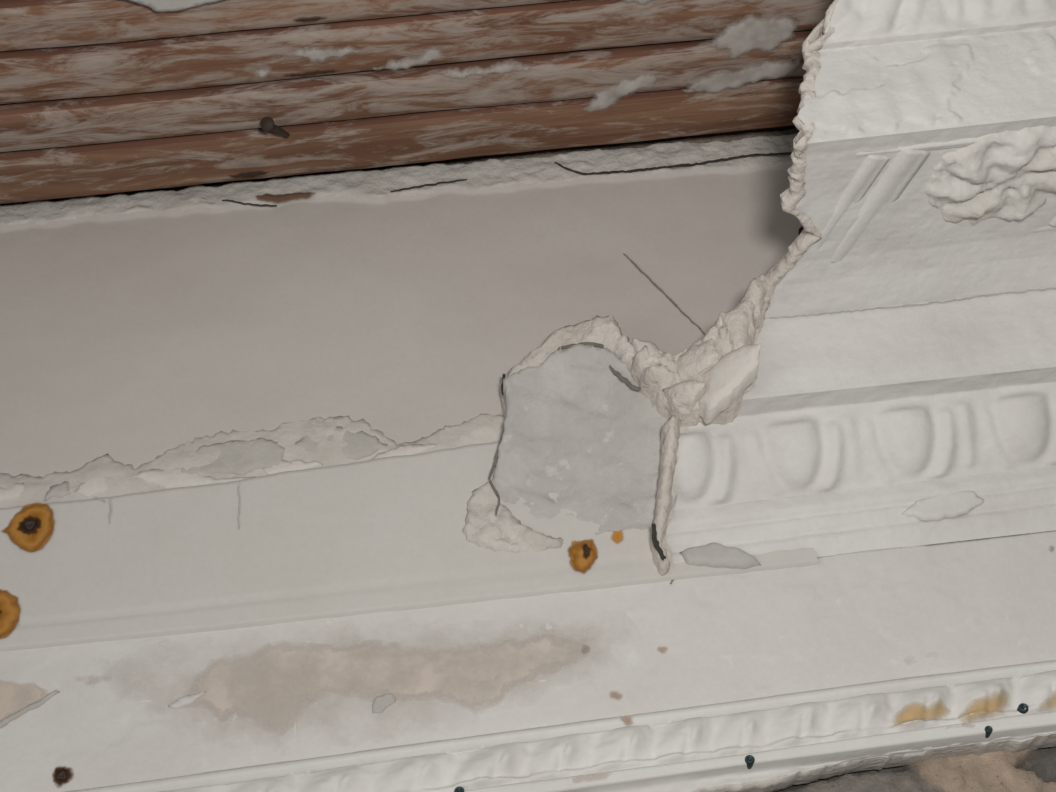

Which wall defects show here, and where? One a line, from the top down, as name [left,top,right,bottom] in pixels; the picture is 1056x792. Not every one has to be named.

crack [222,199,277,207]
crack [391,179,467,192]
crack [555,152,792,175]
spalling [0,0,839,576]
crack [623,253,706,335]
rust [2,502,54,552]
rust [568,539,597,573]
rust [0,590,20,638]